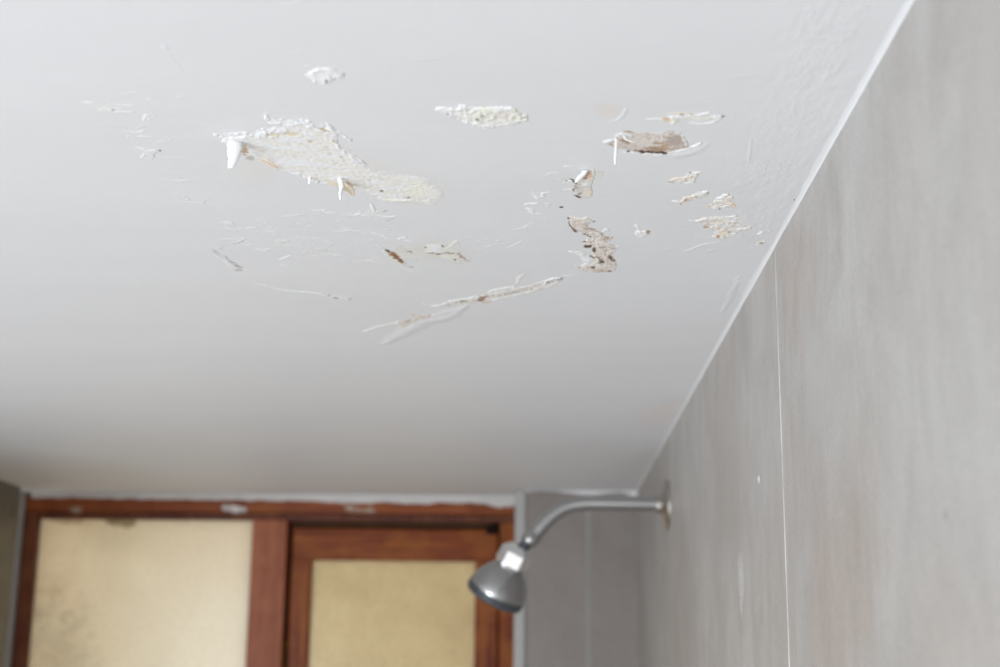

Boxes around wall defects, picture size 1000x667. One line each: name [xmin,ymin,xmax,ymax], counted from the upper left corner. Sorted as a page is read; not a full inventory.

peeling [434,104,529,130]
spalling [603,112,726,165]
peeling [213,115,446,221]
spalling [562,169,604,198]
peeling [379,236,473,273]
spalling [567,215,620,272]